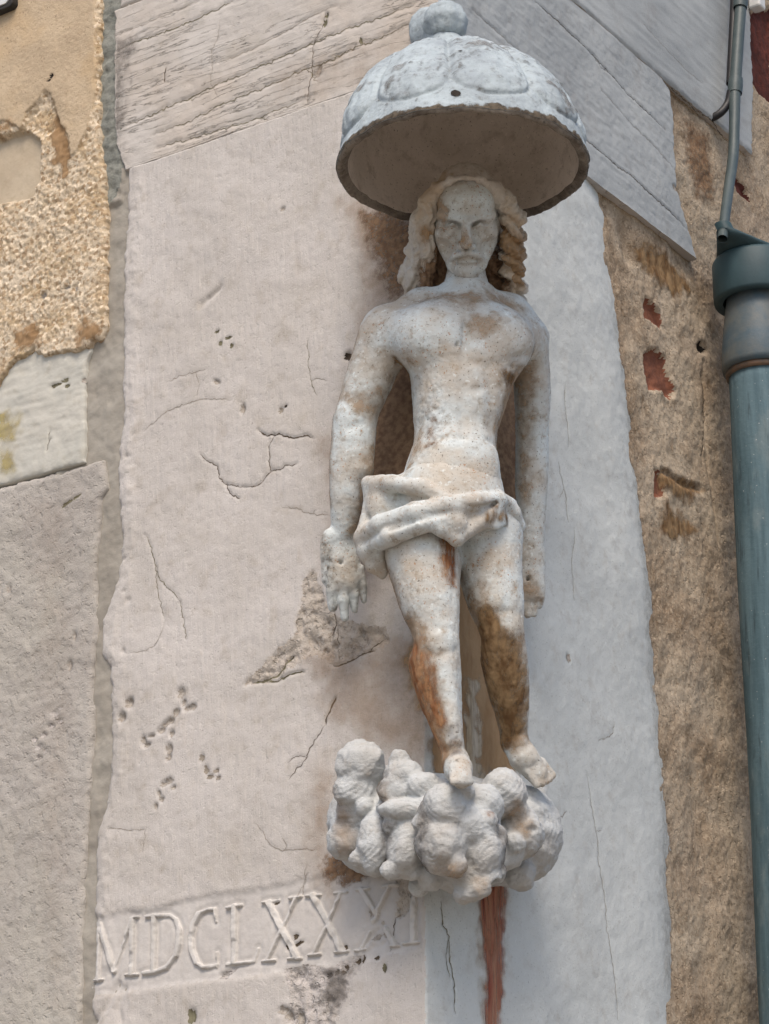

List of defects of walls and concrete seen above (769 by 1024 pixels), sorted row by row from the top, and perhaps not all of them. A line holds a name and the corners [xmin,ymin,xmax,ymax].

flaking render [0,130,42,205]
crack [144,369,226,431]
flaking render [643,348,674,400]
crack [200,431,312,499]
flaking render [654,469,665,498]
crack [130,536,187,653]
spalling [245,570,390,686]
crack [289,698,336,776]
crack [441,903,456,1013]
rust [480,886,506,1024]